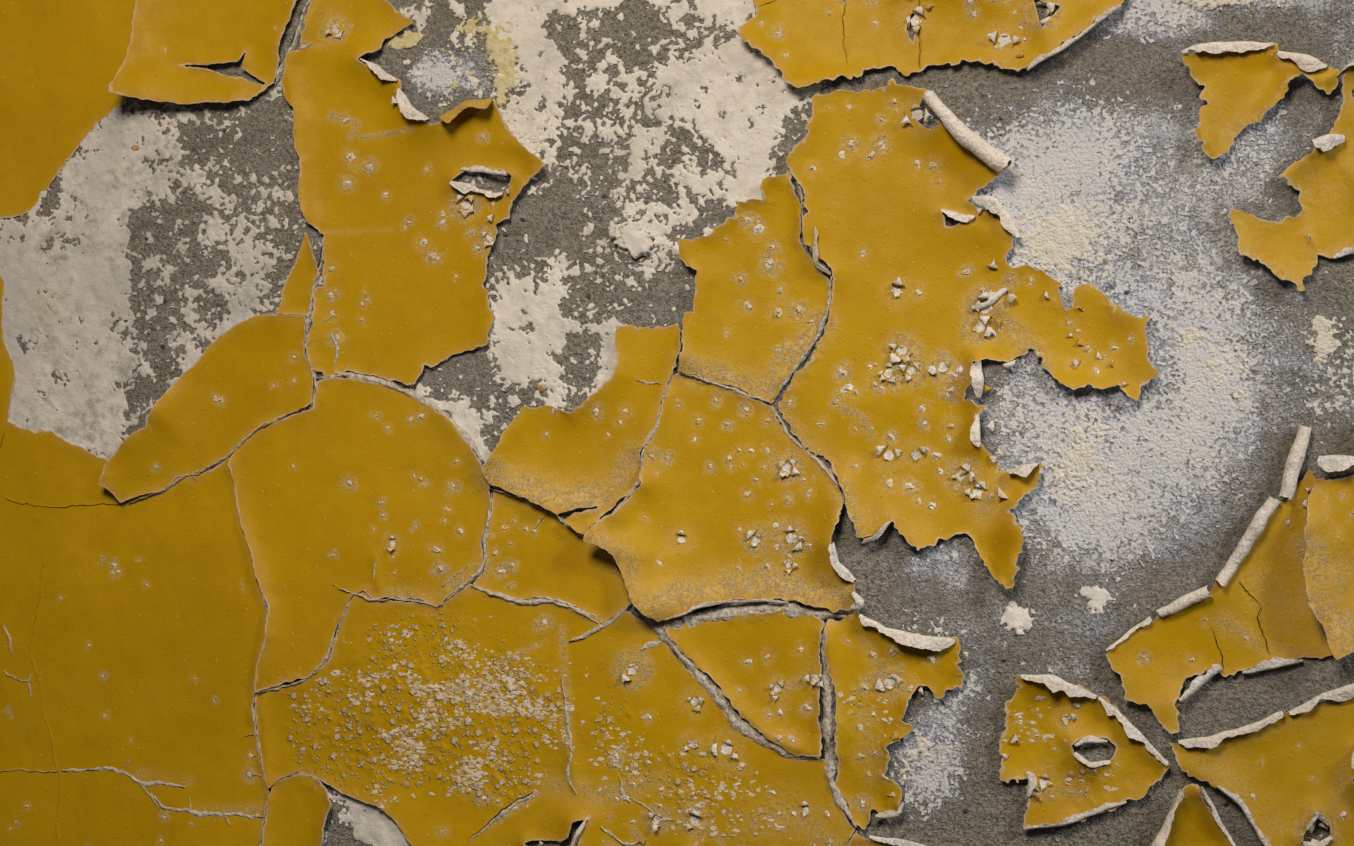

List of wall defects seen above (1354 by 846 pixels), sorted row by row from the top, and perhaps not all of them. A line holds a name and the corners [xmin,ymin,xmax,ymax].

crack [1,237,858,846]
peeling [0,0,926,846]
crack [609,177,840,515]
peeling [738,0,1124,88]
peeling [999,424,1354,846]
peeling [1182,41,1354,291]